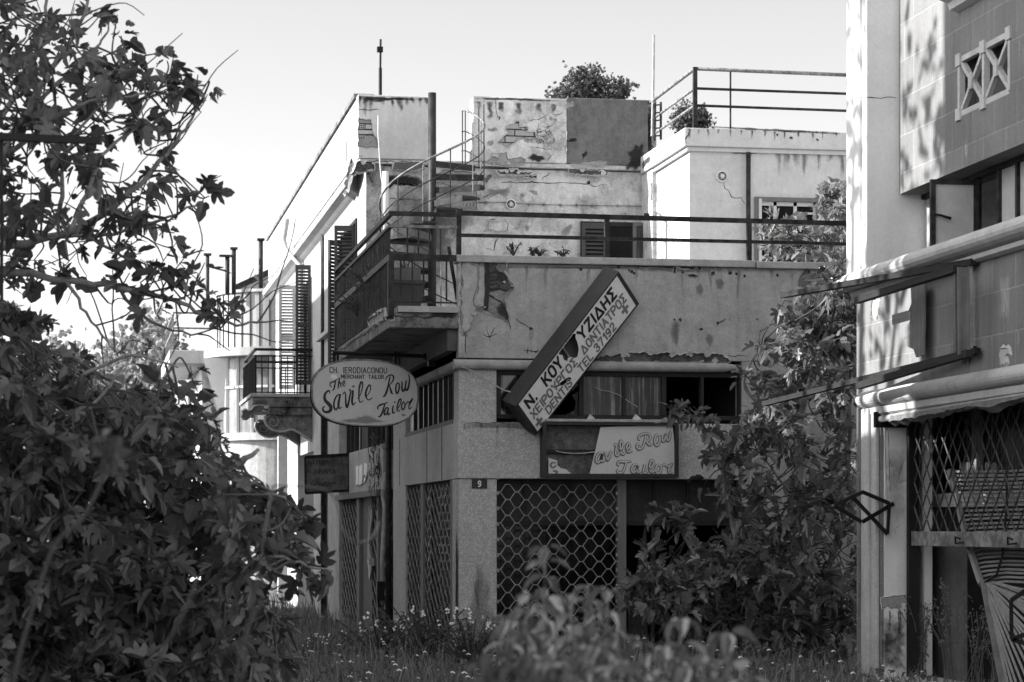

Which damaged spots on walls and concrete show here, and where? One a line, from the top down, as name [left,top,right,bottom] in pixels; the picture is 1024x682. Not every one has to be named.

flaking render [343,117,378,197]
water stain [352,97,428,157]
flaking render [392,116,557,211]
flaking render [457,262,514,336]
flaking render [595,350,731,363]